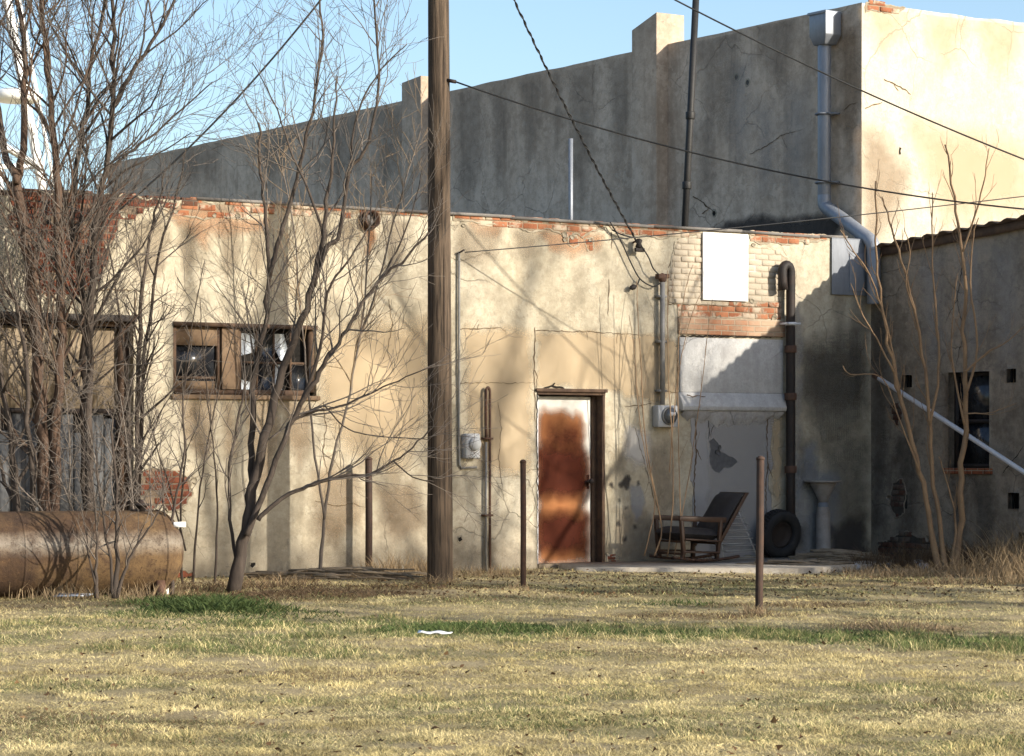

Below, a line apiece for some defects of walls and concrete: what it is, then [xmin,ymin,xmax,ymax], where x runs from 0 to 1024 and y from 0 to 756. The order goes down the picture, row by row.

flaking render [7,187,428,301]
flaking render [452,215,828,320]
flaking render [141,466,197,513]
rust [538,411,589,563]
spalling [709,438,737,473]